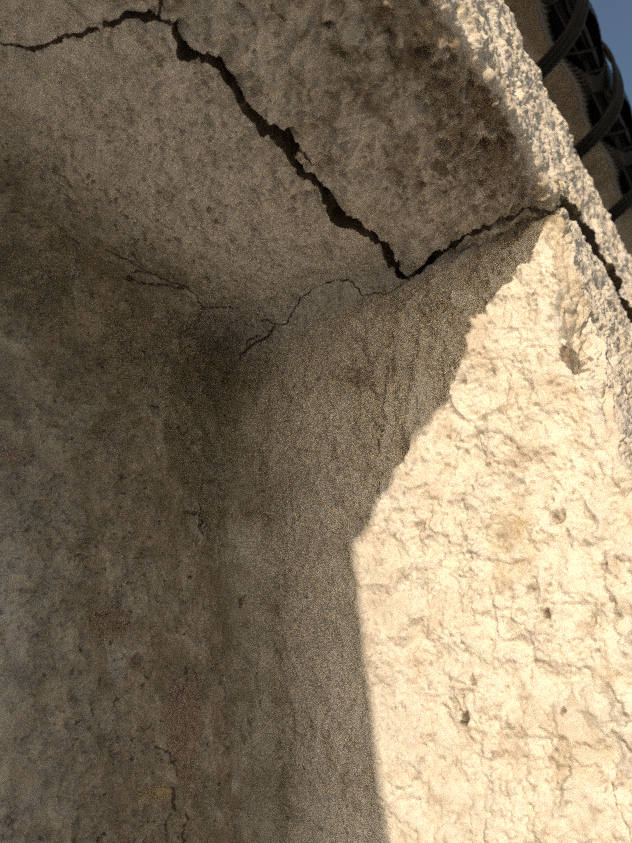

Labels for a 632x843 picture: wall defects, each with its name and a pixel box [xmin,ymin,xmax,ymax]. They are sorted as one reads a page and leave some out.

crack [1,0,632,382]